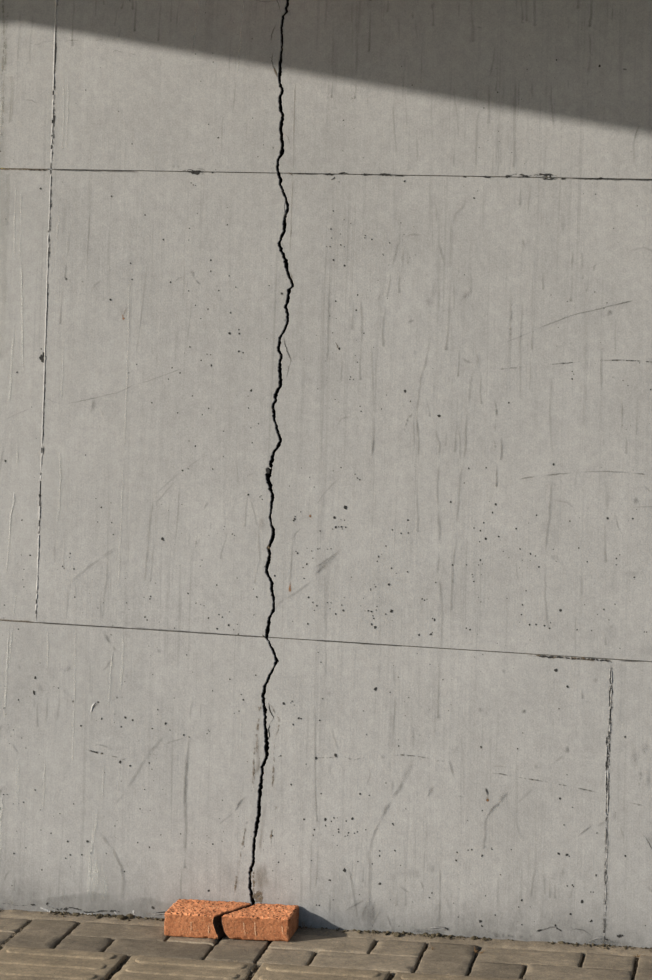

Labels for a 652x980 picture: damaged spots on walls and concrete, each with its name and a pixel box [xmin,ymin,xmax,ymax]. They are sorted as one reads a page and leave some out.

crack [249,0,294,906]